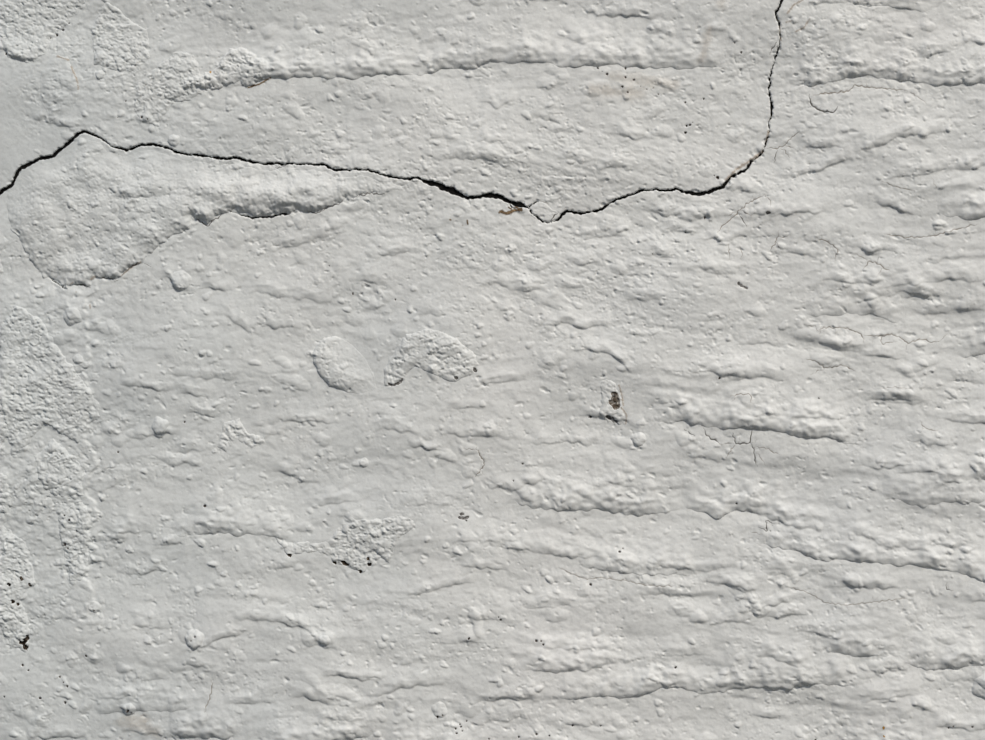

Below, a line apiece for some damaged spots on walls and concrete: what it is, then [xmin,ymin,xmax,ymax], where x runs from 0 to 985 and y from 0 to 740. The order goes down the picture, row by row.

crack [0,0,800,226]
crack [717,195,771,257]
flaking render [0,306,100,581]
flaking render [0,473,36,652]